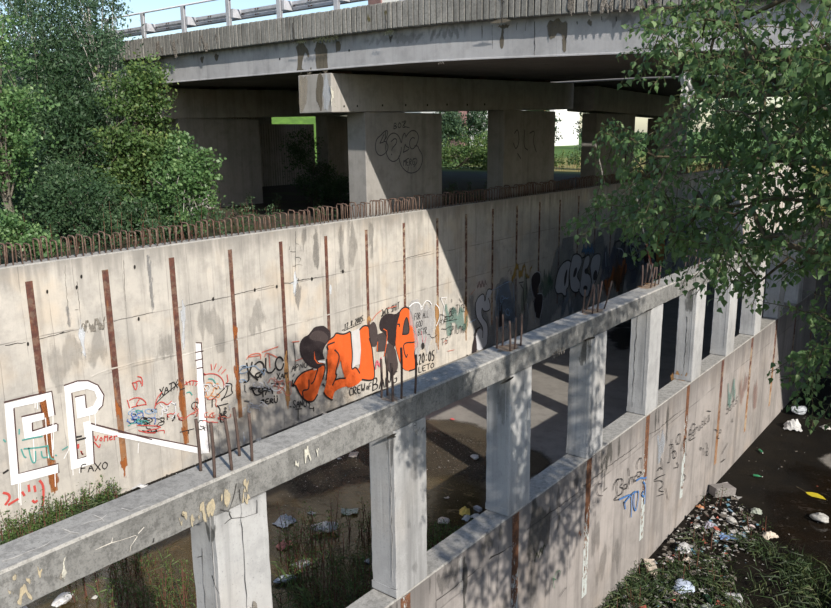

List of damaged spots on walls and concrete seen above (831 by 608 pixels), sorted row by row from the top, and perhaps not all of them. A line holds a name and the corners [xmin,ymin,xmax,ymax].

damp [547,18,592,52]
damp [296,40,350,111]
corrosion [177,378,188,444]
peeling [179,489,230,527]